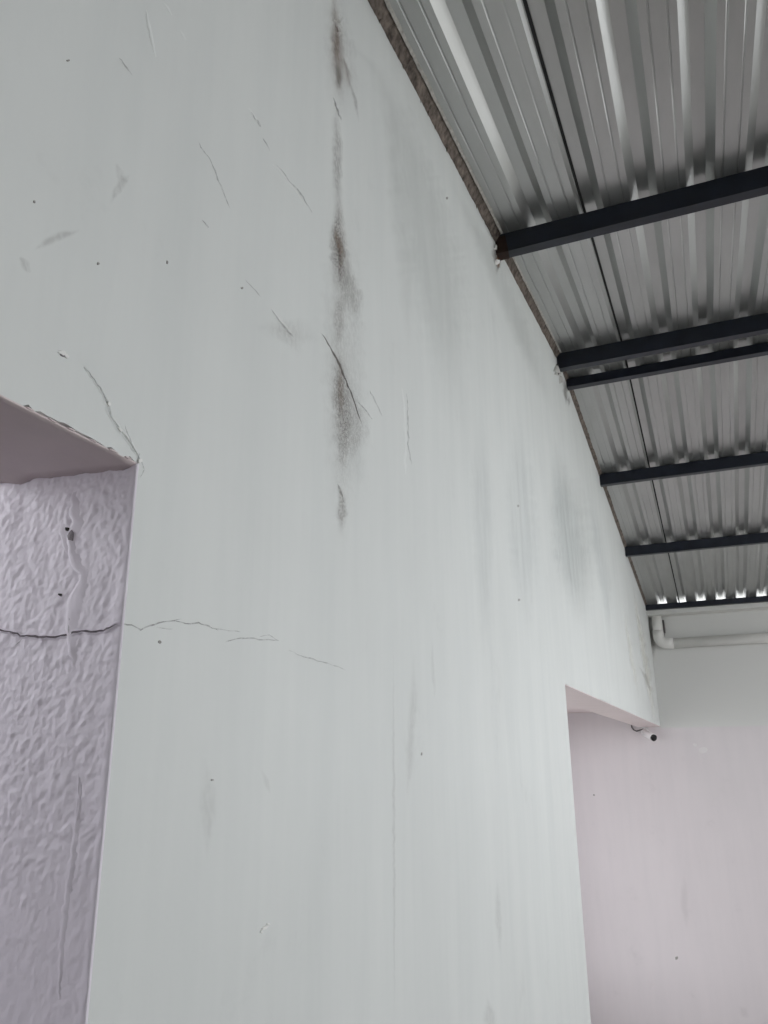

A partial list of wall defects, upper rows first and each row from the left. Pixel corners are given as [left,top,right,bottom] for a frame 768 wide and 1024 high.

crack [83,367,143,464]
crack [320,332,362,424]
crack [0,621,121,641]